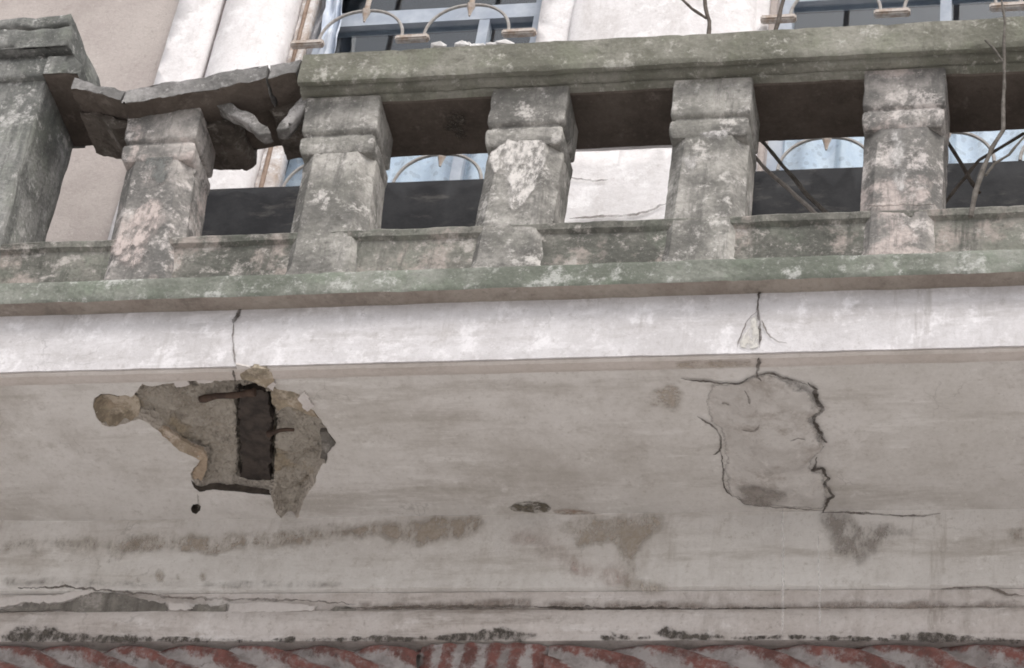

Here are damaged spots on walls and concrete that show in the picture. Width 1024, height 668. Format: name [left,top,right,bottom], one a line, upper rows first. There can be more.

crack [232,309,241,392]
crack [681,292,941,517]
spalling [93,363,336,519]
peeling [511,502,583,515]
water stain [159,536,259,554]
water stain [342,517,479,545]
water stain [578,517,661,559]
water stain [827,513,888,558]
peeling [0,584,356,613]
crack [942,586,1019,596]